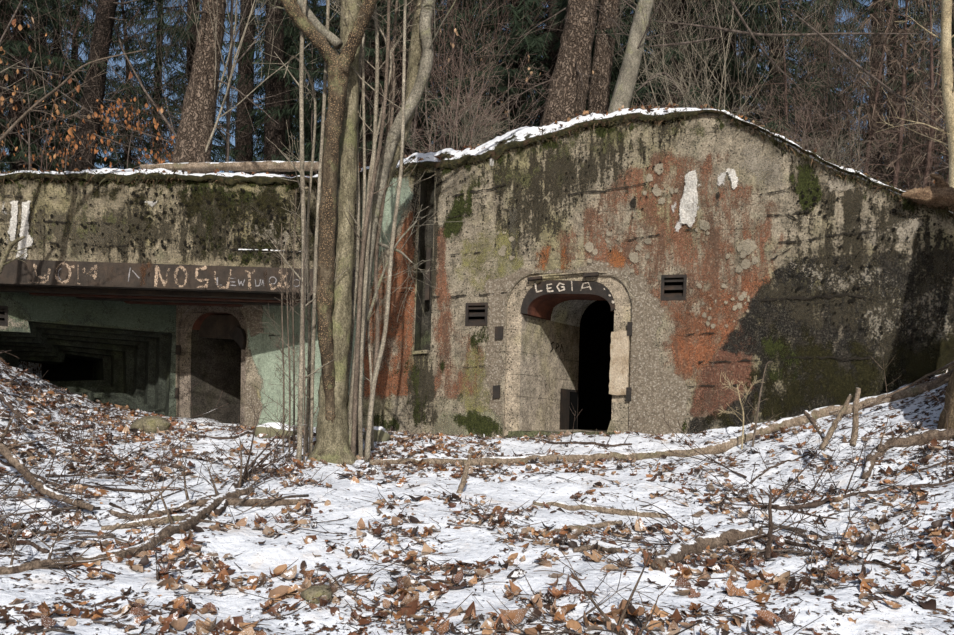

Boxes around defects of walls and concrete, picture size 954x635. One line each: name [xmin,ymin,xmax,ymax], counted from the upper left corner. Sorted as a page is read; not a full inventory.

damp [2,200,33,259]
spalling [484,237,691,436]